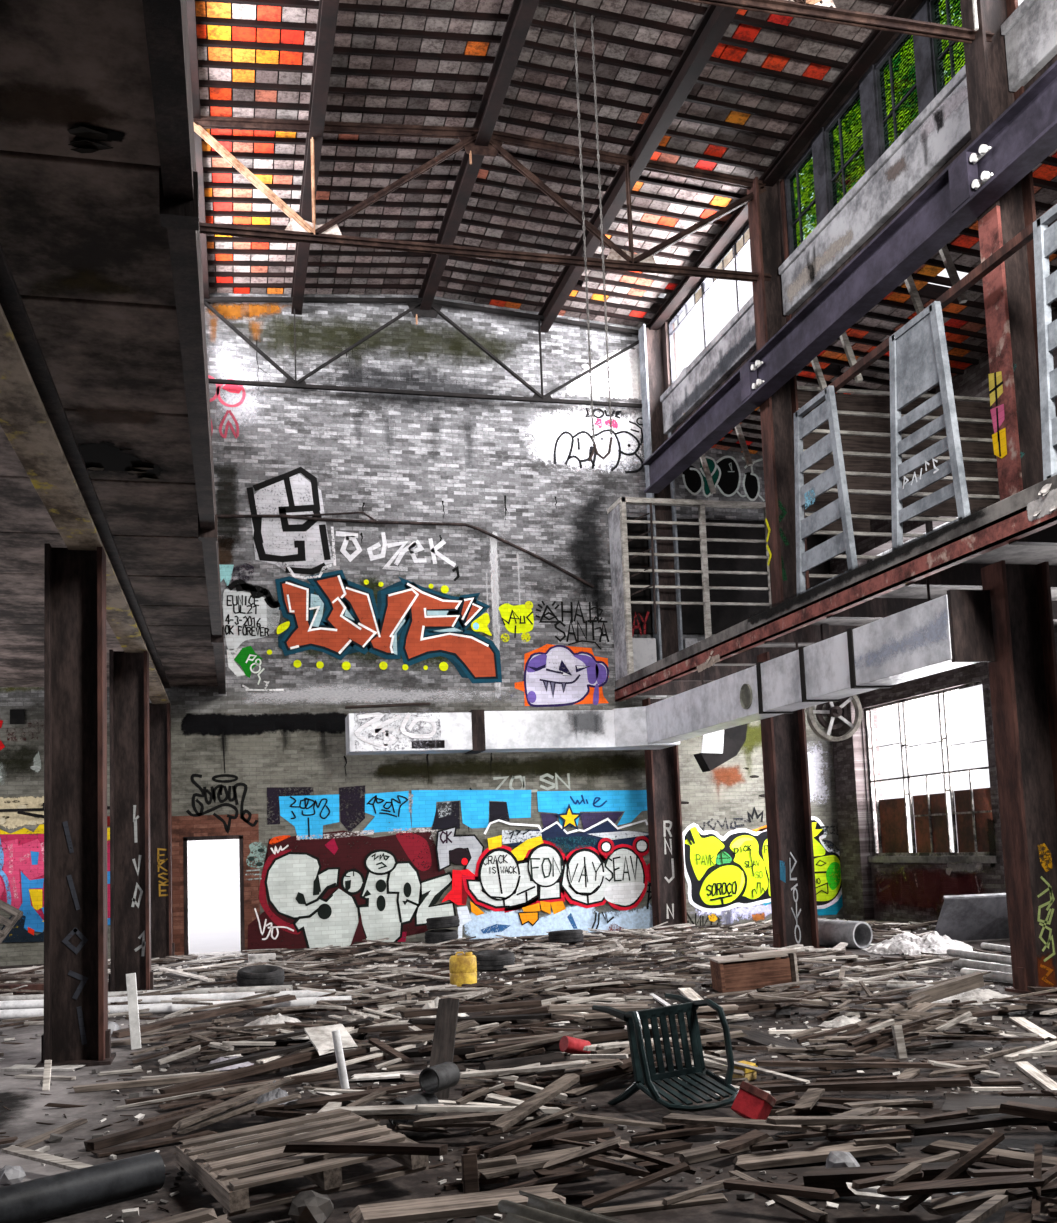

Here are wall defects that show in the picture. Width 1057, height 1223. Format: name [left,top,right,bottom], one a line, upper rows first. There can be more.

damp [221,353,256,425]
damp [232,316,513,408]
damp [490,532,500,651]
damp [571,497,604,611]
damp [181,682,501,748]